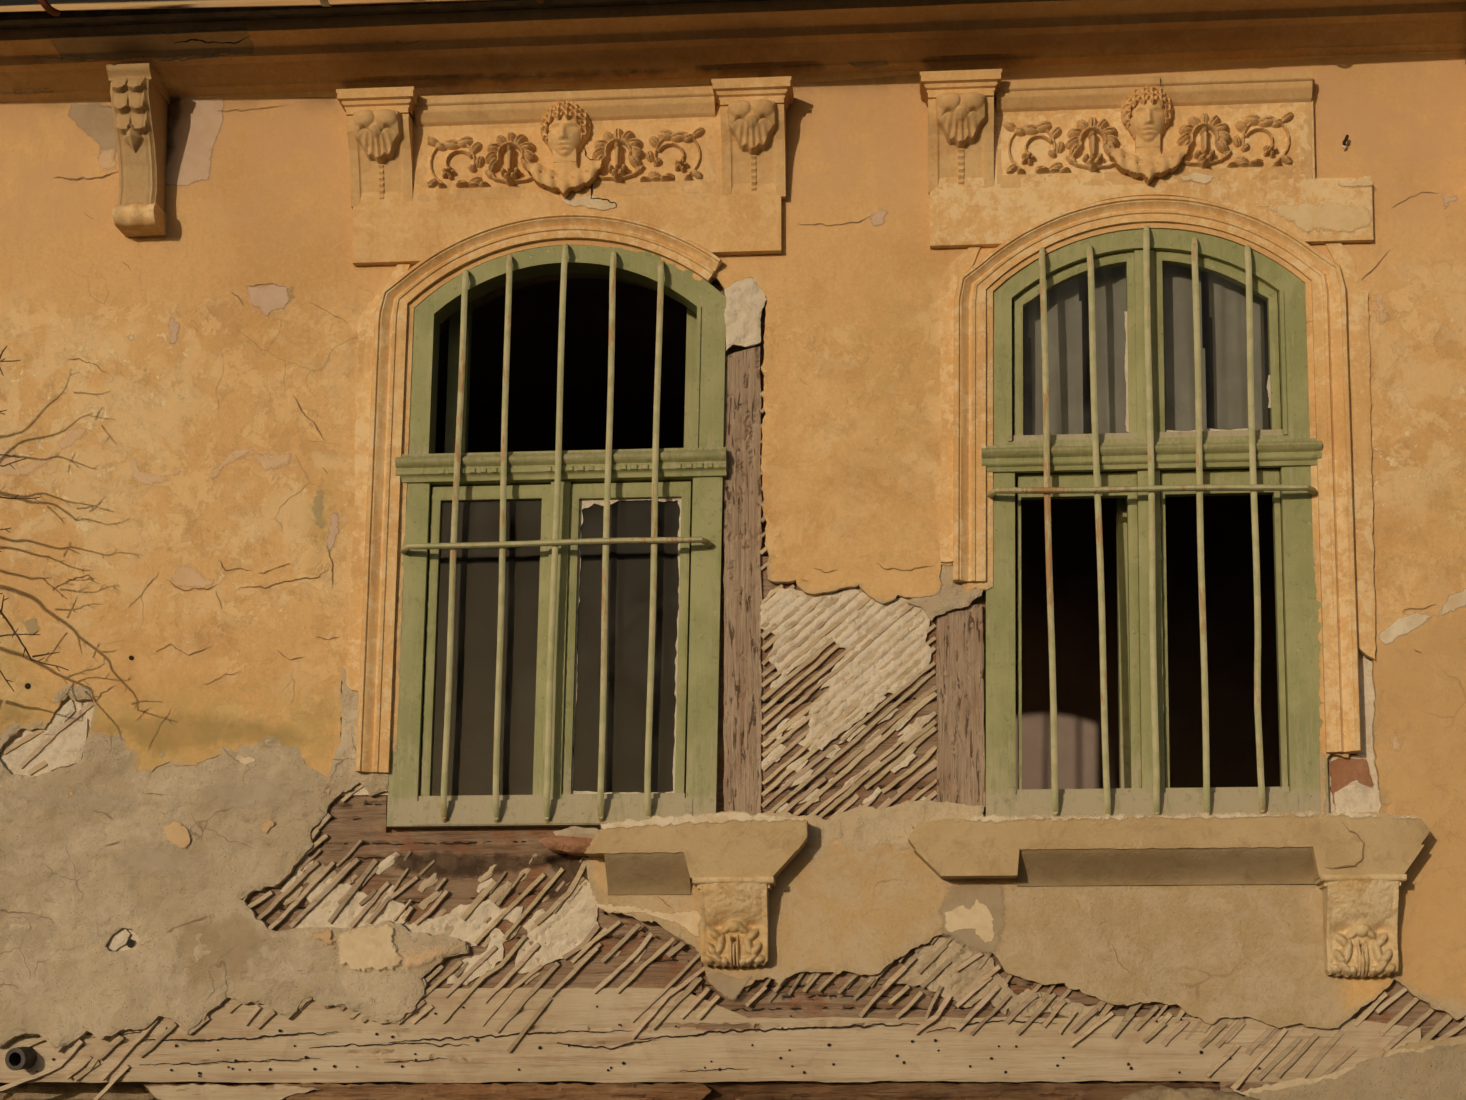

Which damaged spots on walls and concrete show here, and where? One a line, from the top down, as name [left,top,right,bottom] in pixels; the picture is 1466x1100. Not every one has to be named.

peeling [69,103,117,169]
peeling [166,98,224,186]
peeling [248,284,292,316]
flaking render [724,277,767,351]
crack [293,396,328,474]
crack [130,546,333,608]
flaking render [759,390,984,859]
crack [156,644,237,684]
flaking render [0,650,1466,1100]